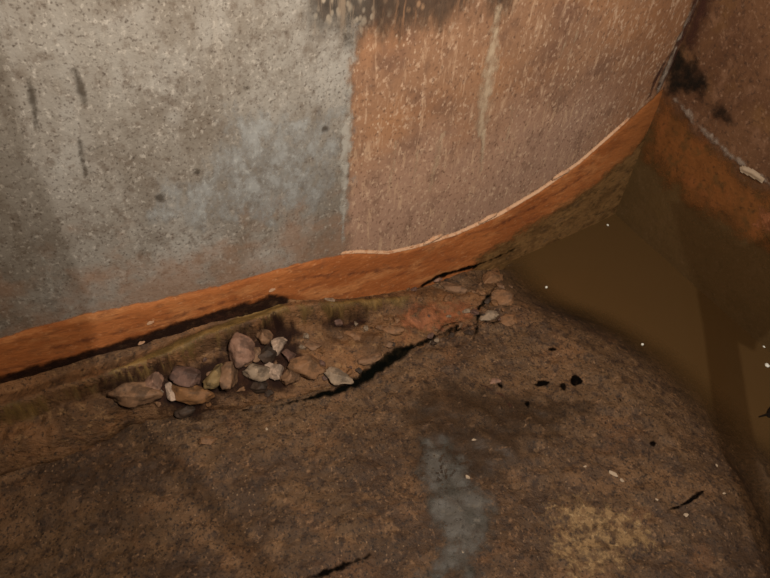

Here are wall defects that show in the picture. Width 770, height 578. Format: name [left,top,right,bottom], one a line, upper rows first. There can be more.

water stain [311,0,466,28]
water stain [669,50,707,122]
corrosion [0,0,770,378]
water stain [701,128,767,183]
crack [242,293,499,410]
water stain [409,384,566,578]
crack [314,554,371,578]